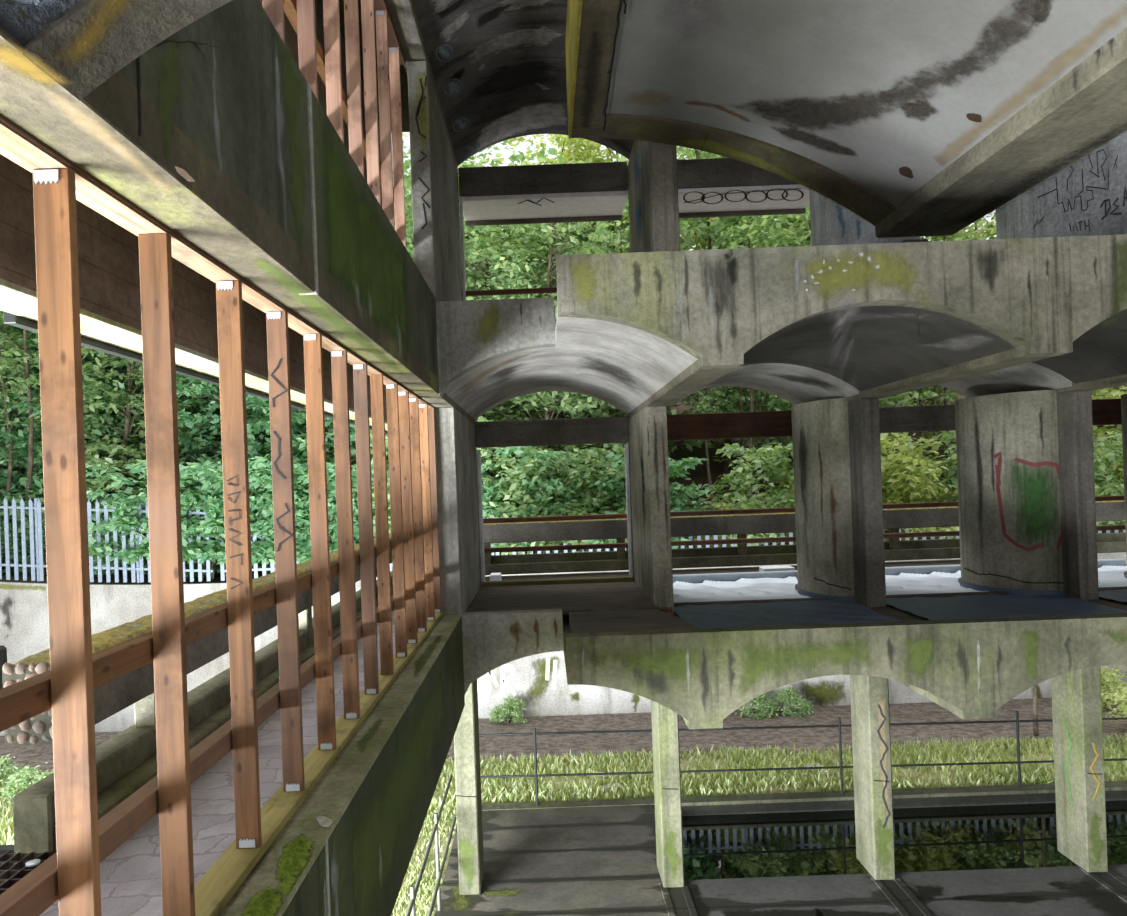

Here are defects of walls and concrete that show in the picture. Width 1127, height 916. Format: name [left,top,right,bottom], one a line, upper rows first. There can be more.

crack [138,40,221,136]
damp [736,0,1050,156]
damp [937,17,1117,164]
damp [704,254,736,317]